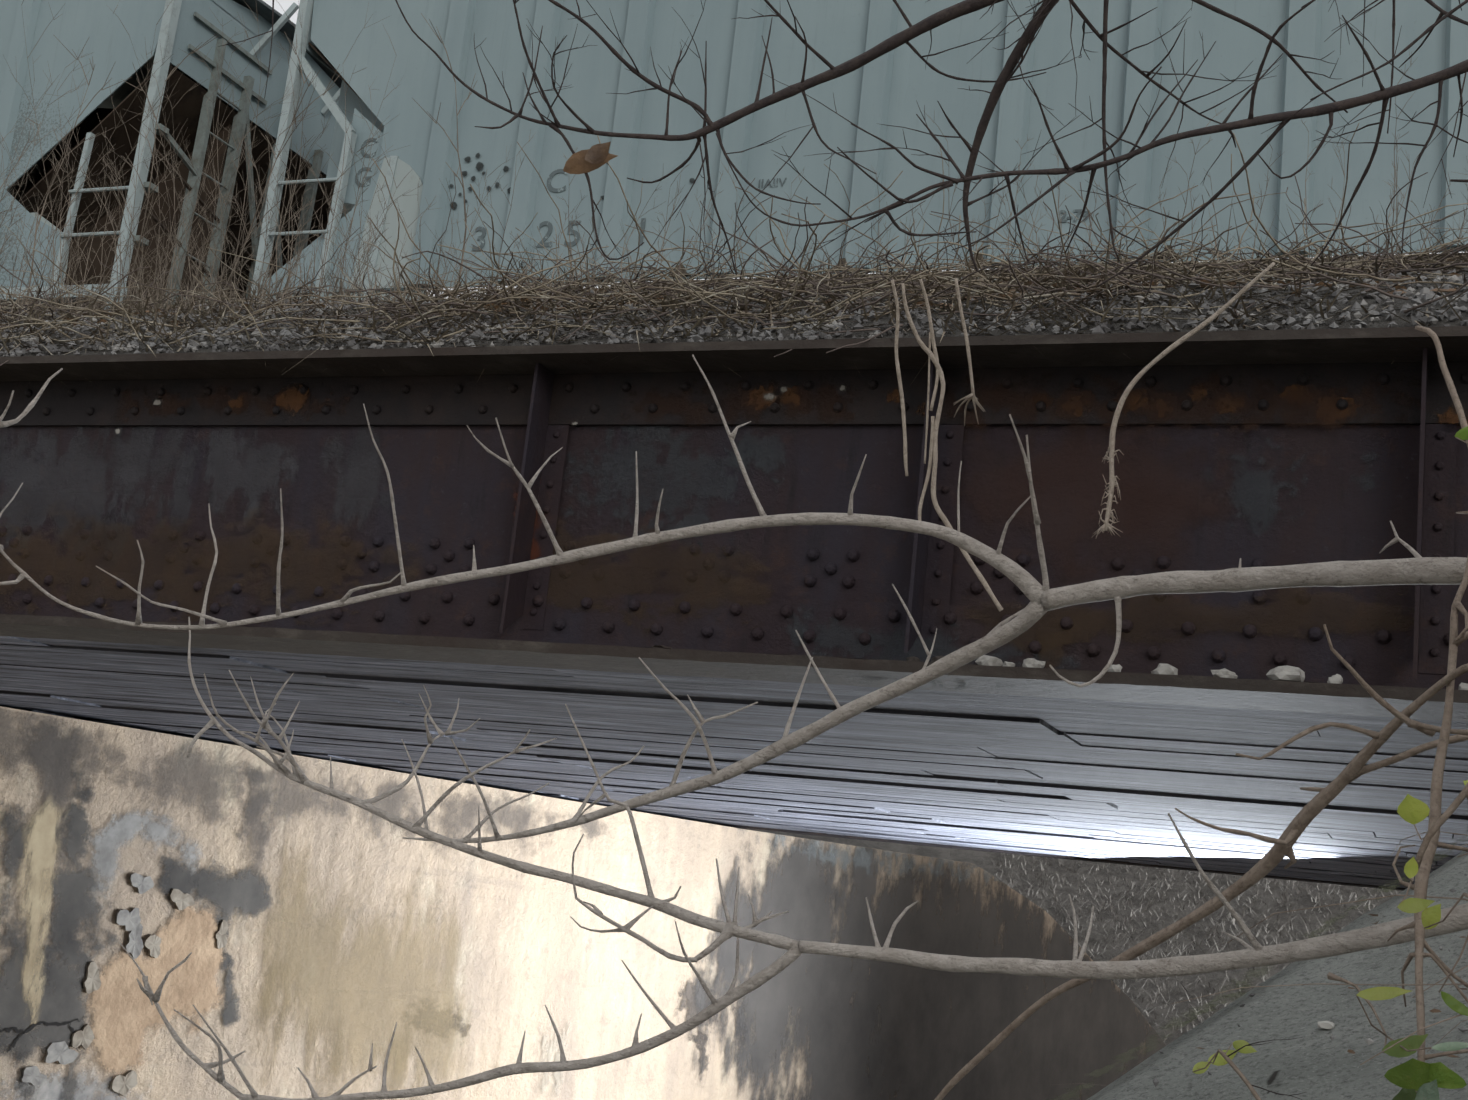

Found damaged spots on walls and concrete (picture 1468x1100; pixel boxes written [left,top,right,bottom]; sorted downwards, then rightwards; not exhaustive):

corrosion [975,394,1218,570]
corrosion [1117,389,1173,418]
water stain [0,709,125,1100]
water stain [158,747,347,1026]
water stain [444,798,530,839]
water stain [676,834,1166,1100]
water stain [542,1027,569,1091]